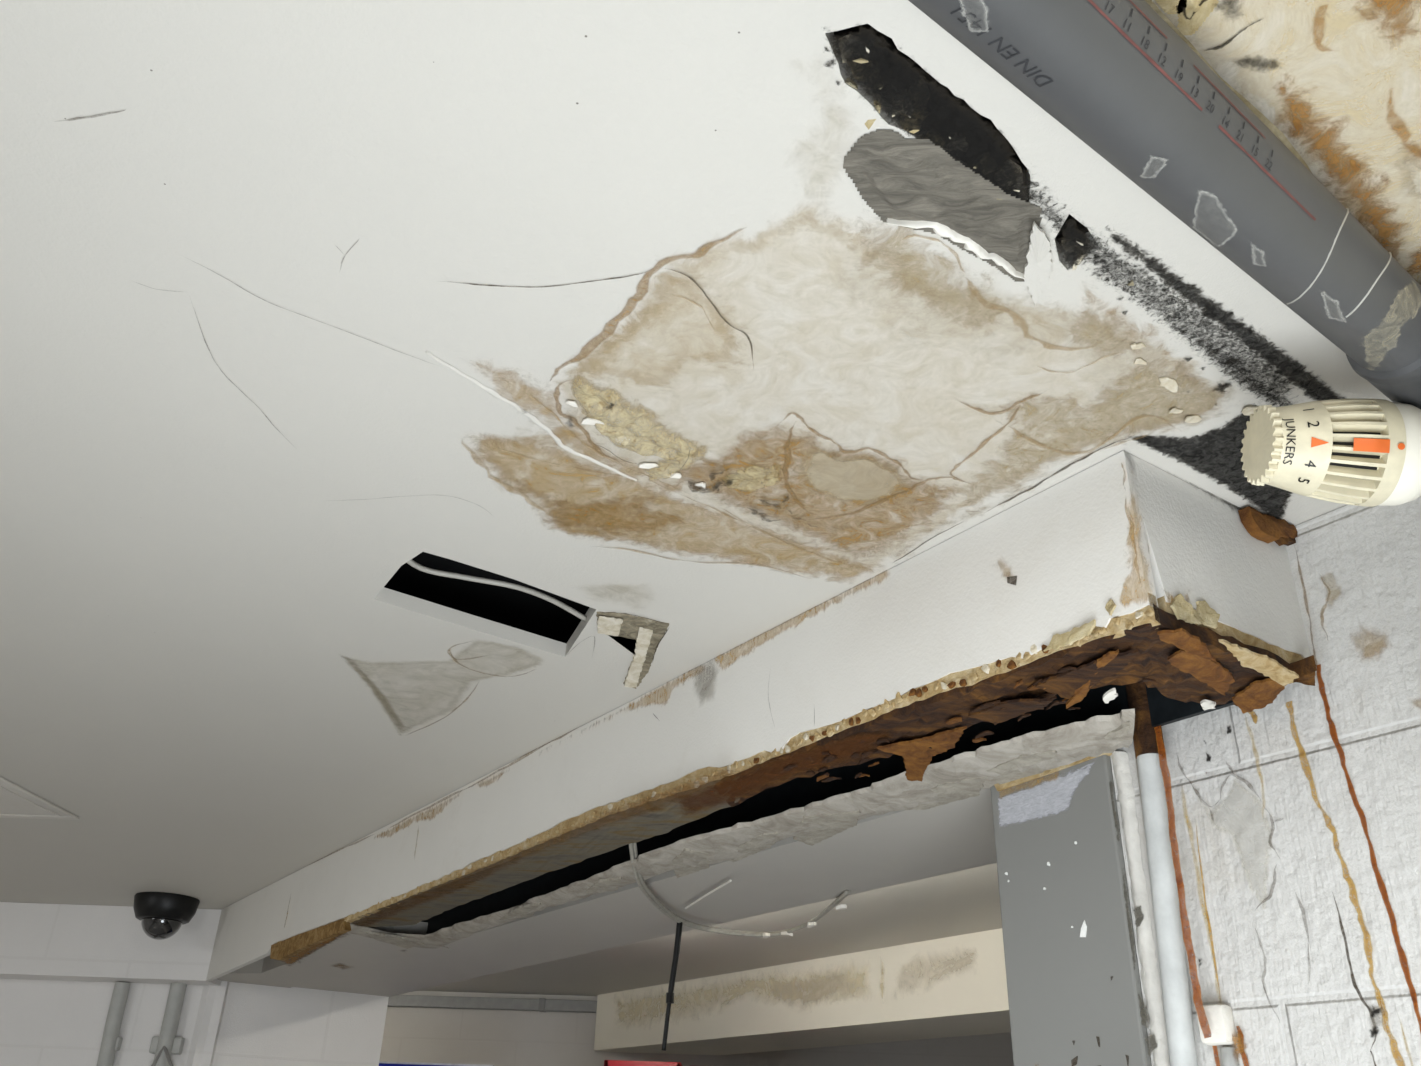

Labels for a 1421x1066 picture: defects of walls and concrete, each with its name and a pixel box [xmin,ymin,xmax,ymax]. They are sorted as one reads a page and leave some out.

water stain [1183,0,1235,19]
water stain [1238,36,1291,69]
water stain [1314,0,1421,51]
water stain [1279,87,1421,274]
water stain [554,235,731,376]
water stain [518,388,608,457]
water stain [681,227,1345,589]
water stain [495,443,696,551]
spalling [320,593,1303,1066]
corrosion [270,604,1421,1066]
crack [1334,898,1381,1066]